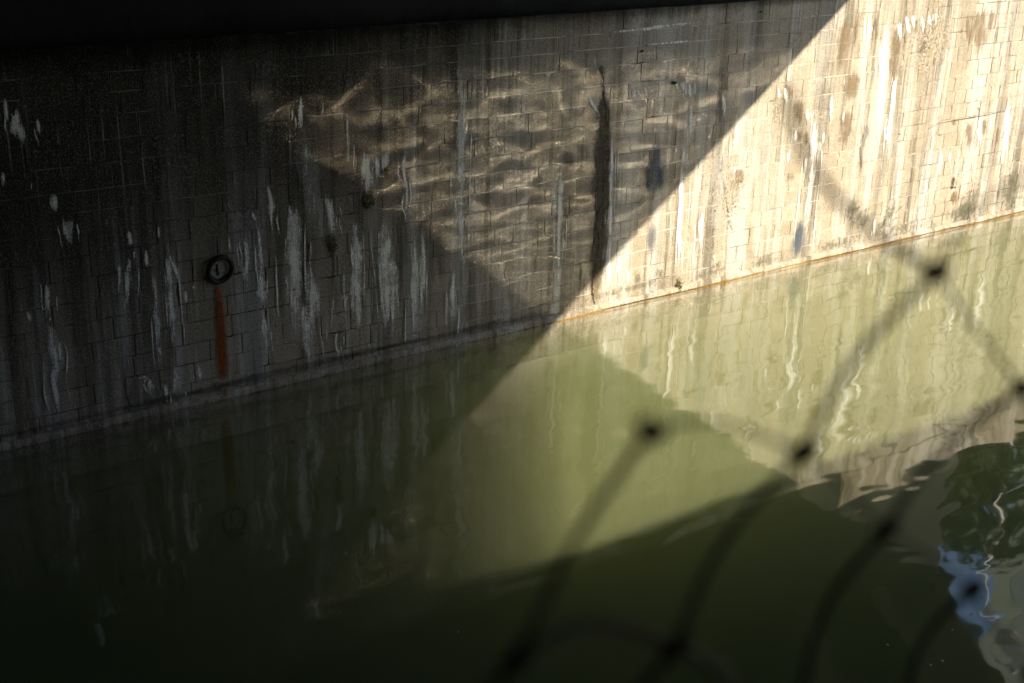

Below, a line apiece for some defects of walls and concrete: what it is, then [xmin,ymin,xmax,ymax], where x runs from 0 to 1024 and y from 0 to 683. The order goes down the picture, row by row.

leakage [4,99,40,141]
leakage [339,117,412,222]
leakage [450,88,472,262]
leakage [553,70,1024,323]
leakage [830,14,937,166]
leakage [964,12,996,48]
leakage [40,285,70,421]
rust [215,286,228,395]
leakage [228,187,428,360]
leakage [445,273,468,332]